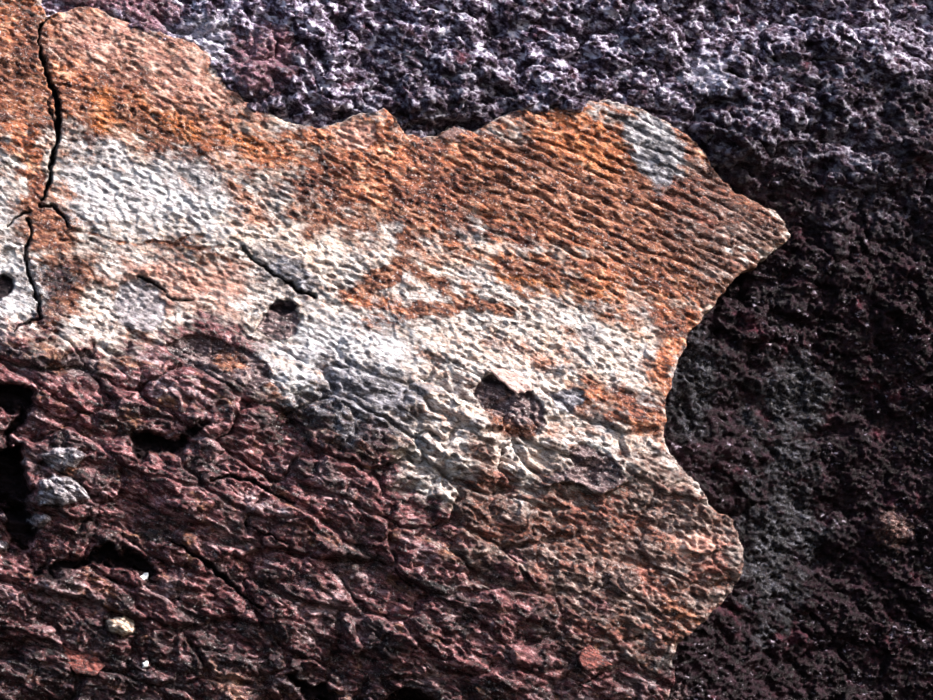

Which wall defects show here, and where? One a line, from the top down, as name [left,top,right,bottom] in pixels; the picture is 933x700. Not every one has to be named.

crack [9,18,68,332]
rust [0,0,786,437]
spalling [0,274,14,299]
spalling [115,279,166,331]
spalling [257,300,300,340]
crack [249,256,316,298]
spalling [166,335,271,391]
spalling [474,368,545,441]
peeling [545,444,626,493]
rust [449,433,744,667]
peeling [679,532,718,552]
peeling [578,643,612,670]